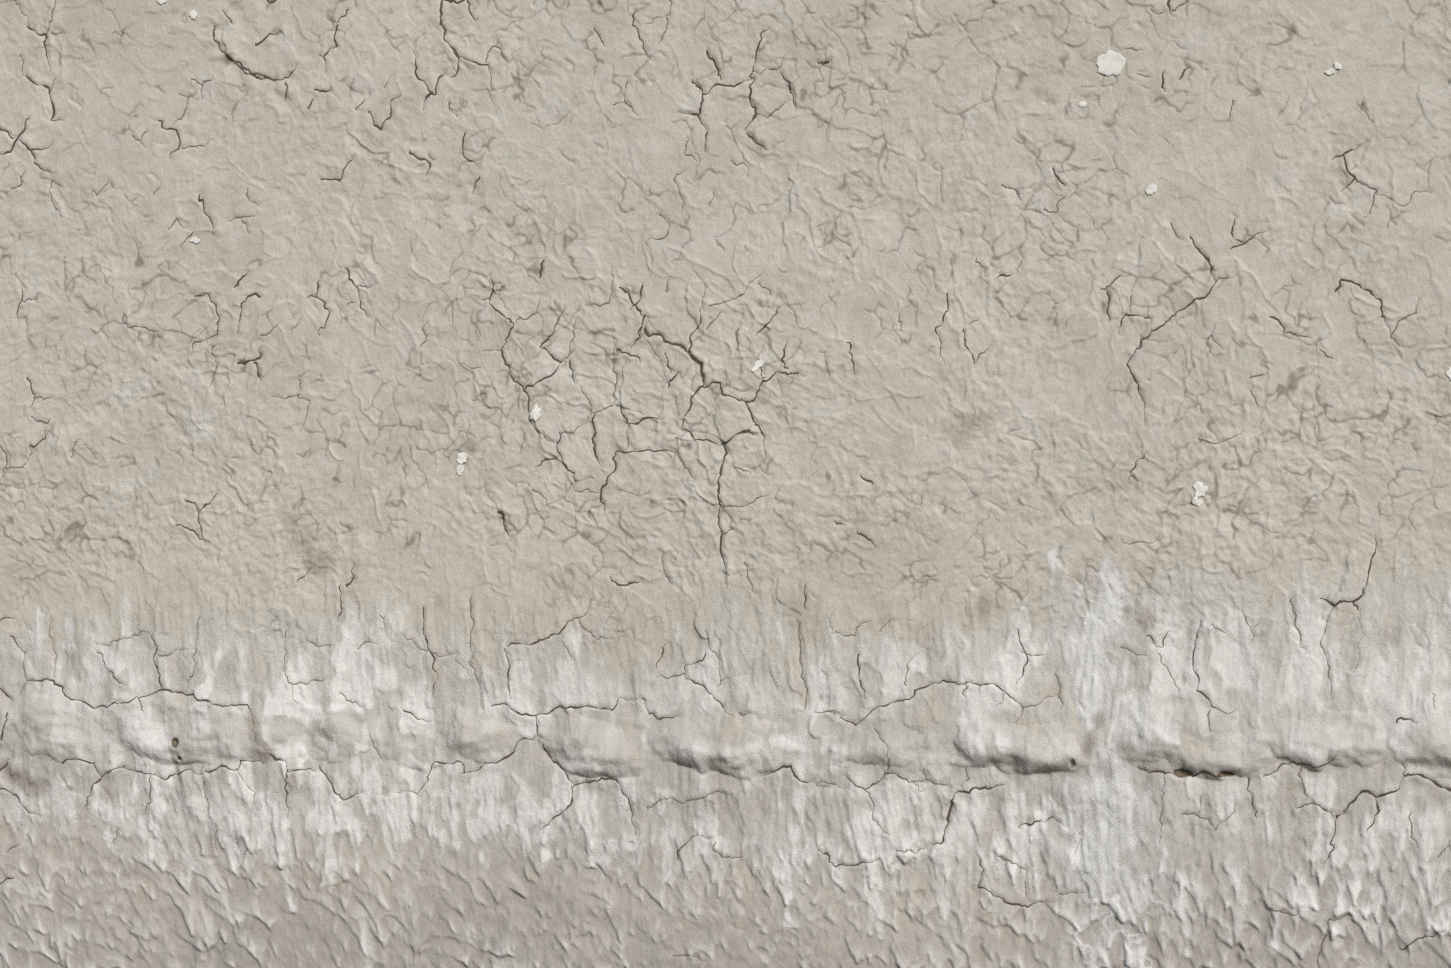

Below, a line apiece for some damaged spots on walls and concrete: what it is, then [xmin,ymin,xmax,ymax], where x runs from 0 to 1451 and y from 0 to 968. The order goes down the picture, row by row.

crack [0,0,65,217]
crack [132,0,507,247]
crack [651,29,831,240]
crack [122,268,375,431]
crack [461,260,855,594]
crack [1100,217,1268,481]
crack [0,616,360,884]
crack [284,555,1085,867]
leakage [0,546,1451,968]
crack [978,816,1081,908]
crack [1120,538,1377,732]
crack [1137,754,1451,862]